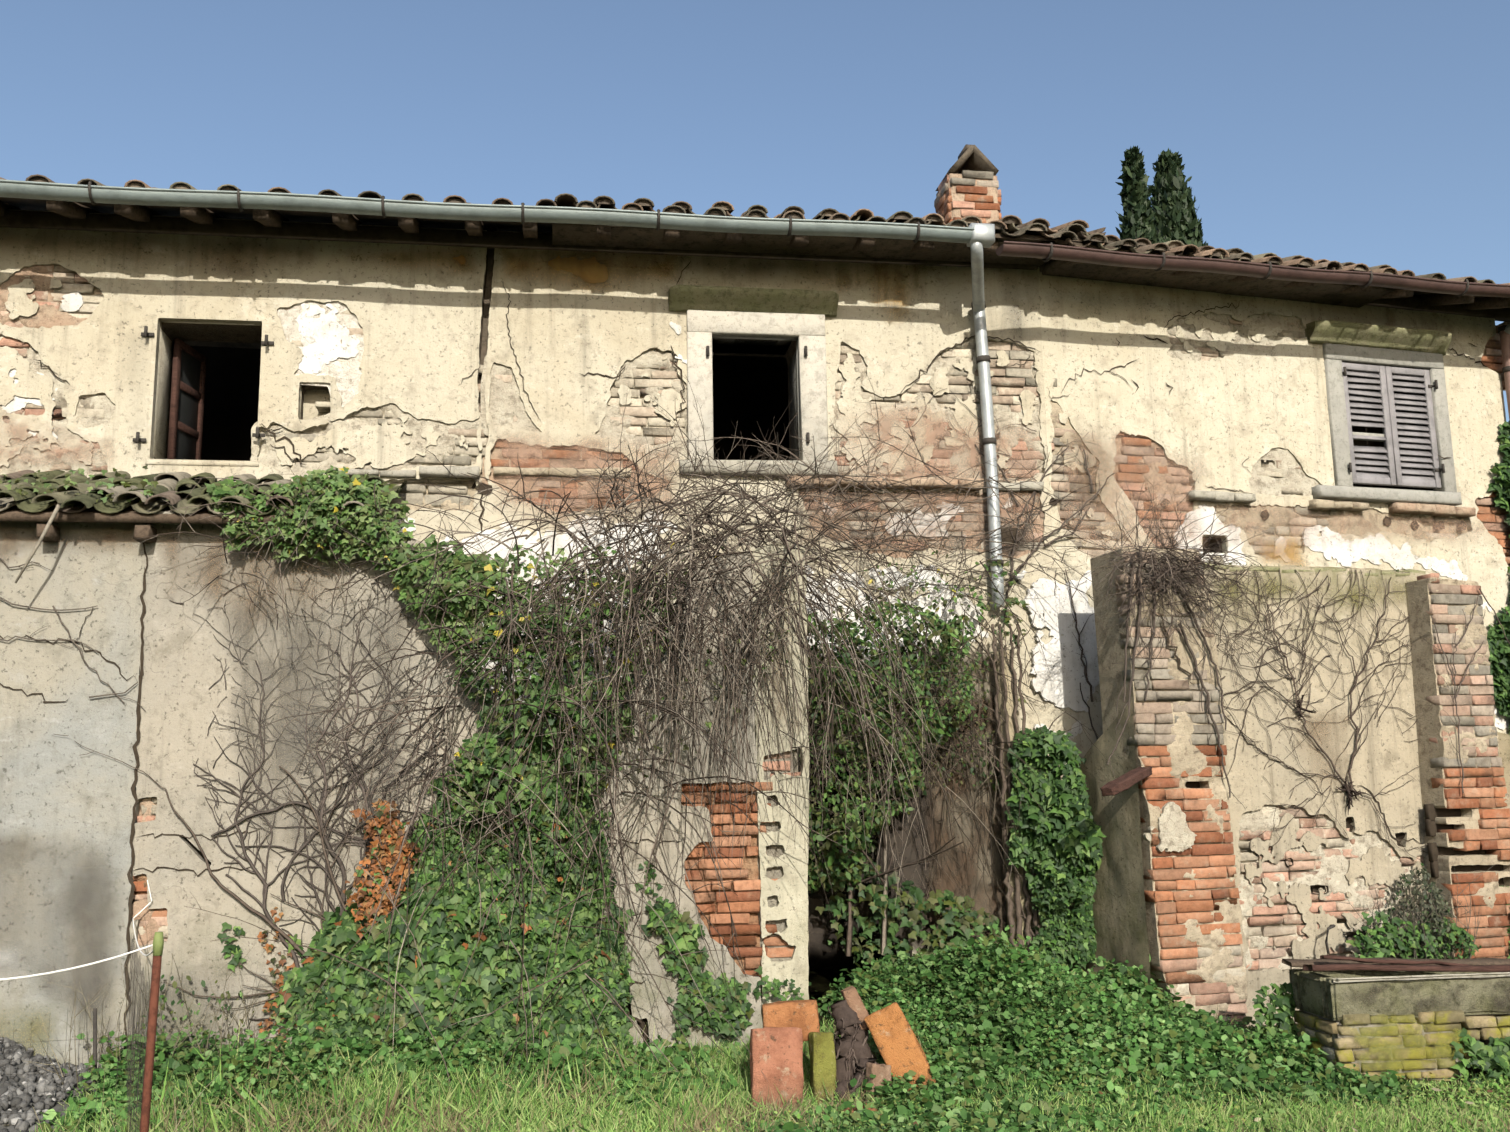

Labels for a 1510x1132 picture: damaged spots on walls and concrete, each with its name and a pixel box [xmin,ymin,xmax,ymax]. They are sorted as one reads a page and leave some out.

spalling [0,265,116,476]
crack [462,225,541,421]
spalling [250,301,688,745]
crack [471,472,485,537]
spalling [798,337,1510,745]
crack [0,523,260,1049]
spalling [681,781,777,979]
spalling [1238,805,1426,971]